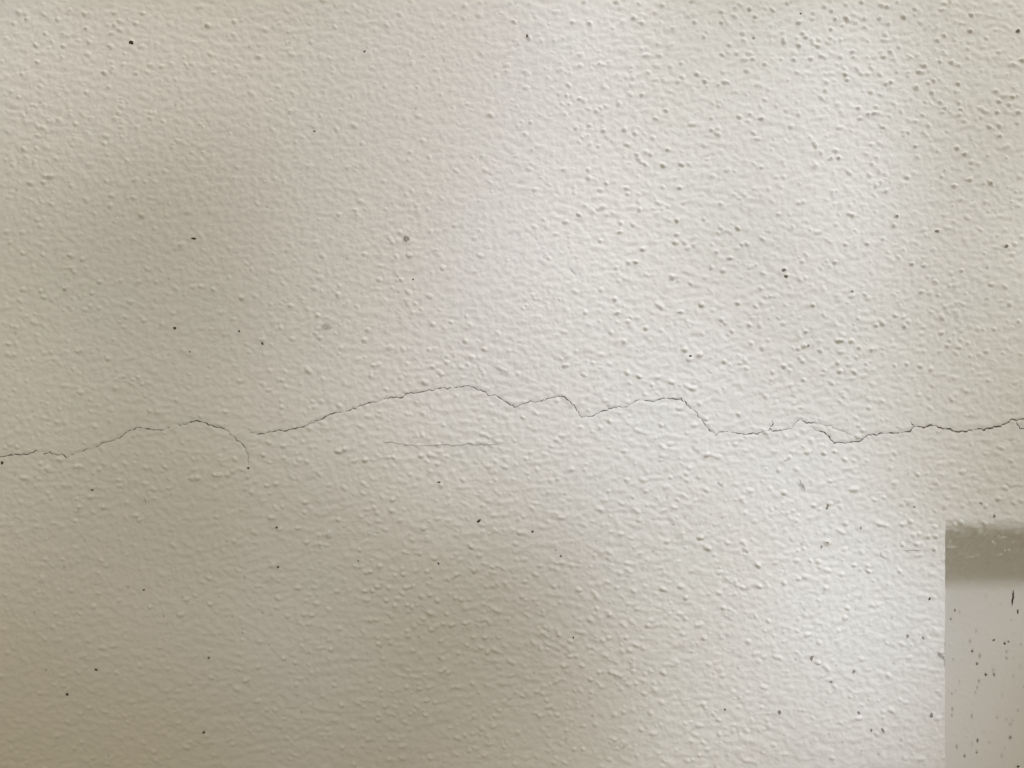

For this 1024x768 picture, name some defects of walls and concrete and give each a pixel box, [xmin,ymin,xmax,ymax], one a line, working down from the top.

crack [0,385,1024,464]